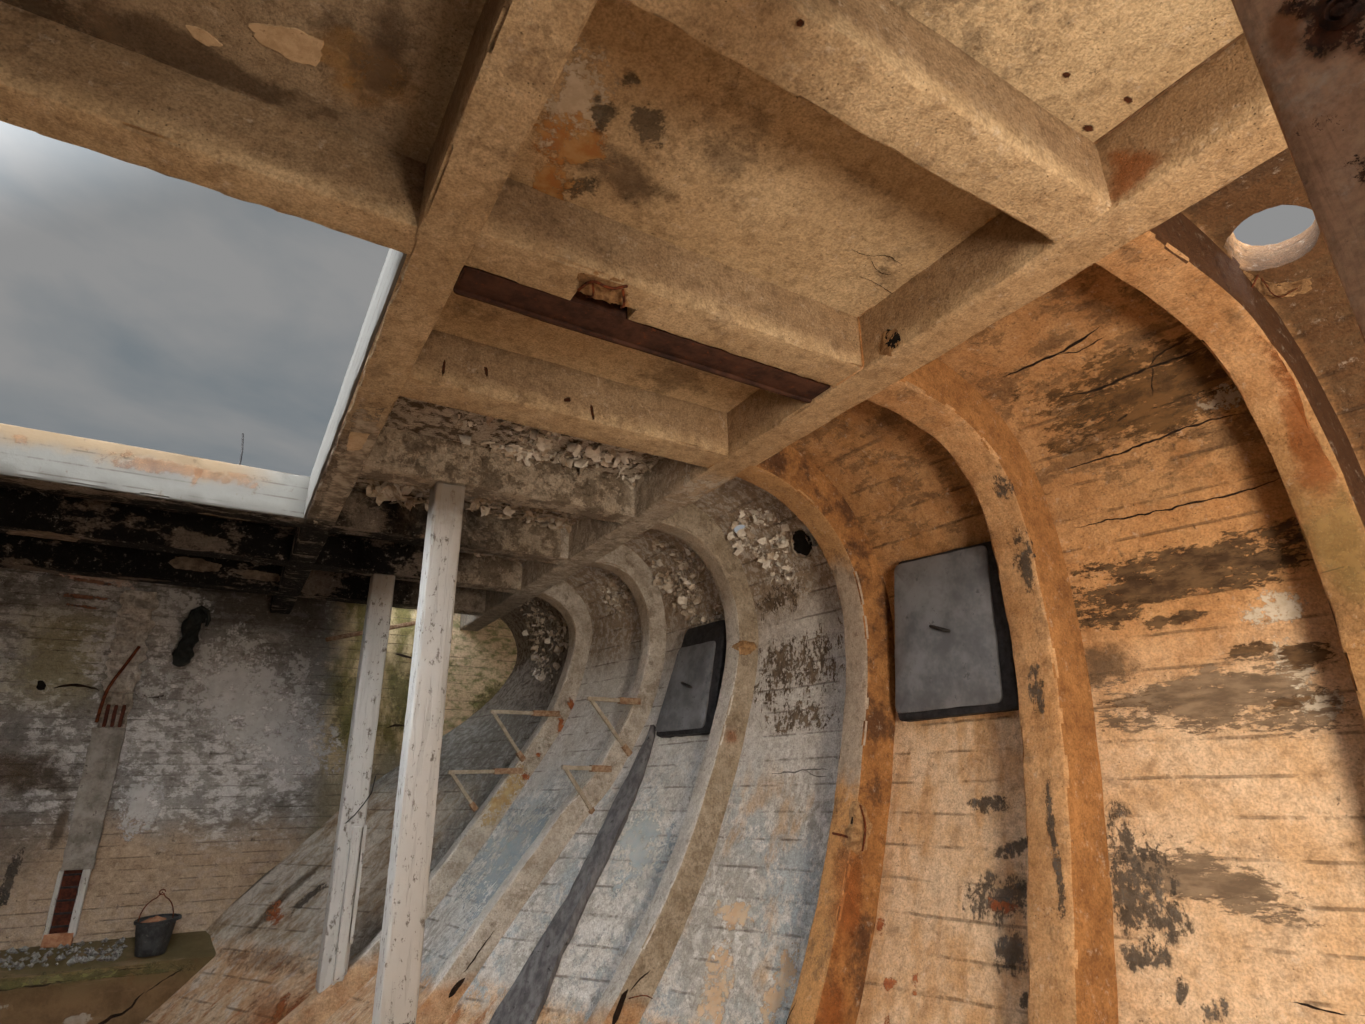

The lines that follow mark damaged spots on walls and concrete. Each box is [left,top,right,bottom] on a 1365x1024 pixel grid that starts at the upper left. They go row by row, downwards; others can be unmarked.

peeling [186,25,223,47]
peeling [248,23,406,103]
corrosion [1279,0,1365,58]
damp [532,38,667,204]
corrosion [1348,154,1365,183]
peeling [449,413,653,487]
peeling [169,557,280,582]
mould [958,837,1028,978]
mould [1105,799,1194,1007]
crack [0,967,184,1024]
crack [612,972,653,1024]
mould [1200,997,1228,1024]